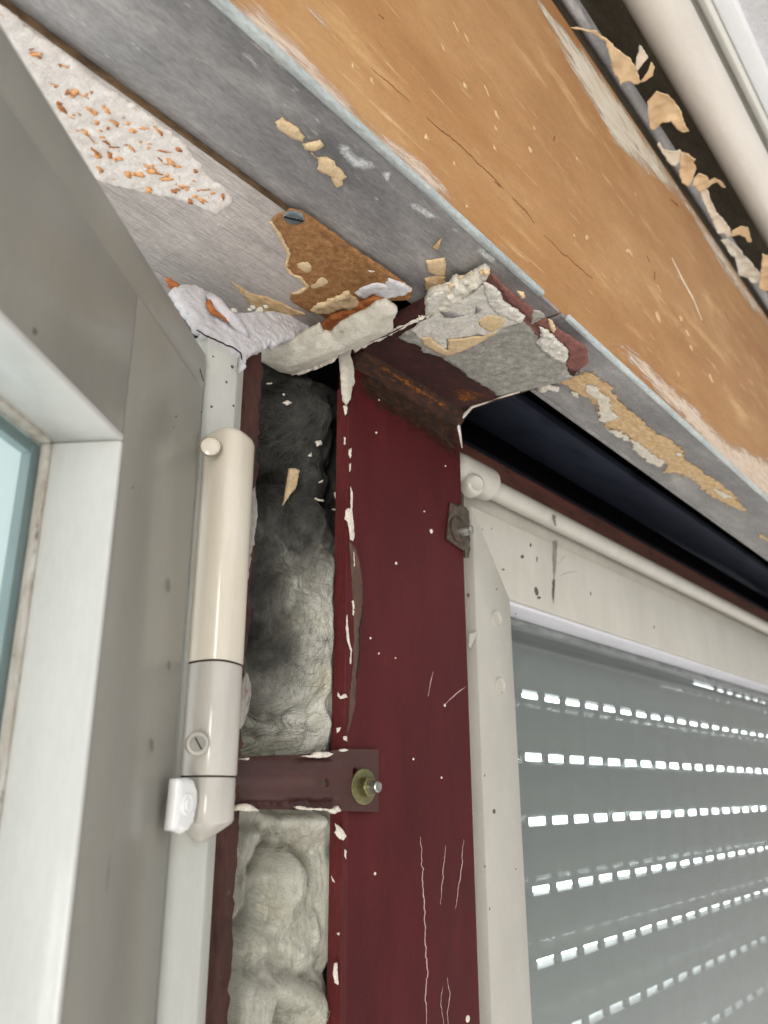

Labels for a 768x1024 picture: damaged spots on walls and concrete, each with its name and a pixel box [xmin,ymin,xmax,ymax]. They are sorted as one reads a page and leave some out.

flaking render [0,5,232,215]
peeling [275,117,347,188]
crack [371,68,593,279]
peeling [570,27,655,85]
peeling [647,91,689,133]
peeling [657,142,768,291]
rust [361,367,459,452]
peeling [165,208,751,515]
peeling [336,486,363,741]